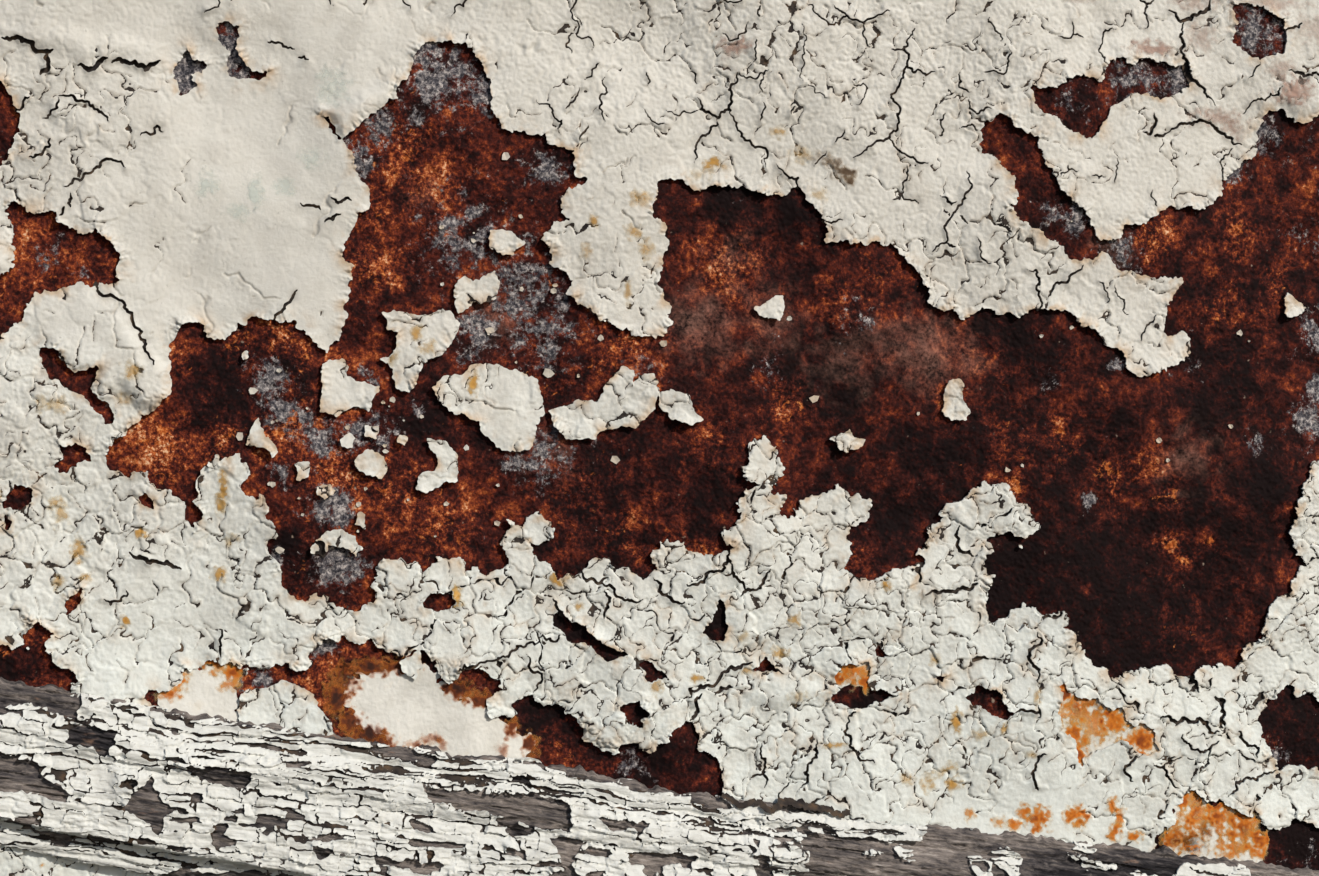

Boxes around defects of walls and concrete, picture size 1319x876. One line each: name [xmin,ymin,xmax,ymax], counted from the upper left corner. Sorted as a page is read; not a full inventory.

peeling [0,201,120,339]
crack [0,35,168,228]
crack [300,196,351,222]
crack [509,0,1319,374]
peeling [39,40,1319,683]
crack [0,281,1319,876]
corrosion [324,658,404,747]
spalling [144,635,724,797]
corrosion [441,681,491,708]
corrosion [1058,683,1157,766]
peeling [1257,684,1319,771]
corrosion [1161,790,1269,859]